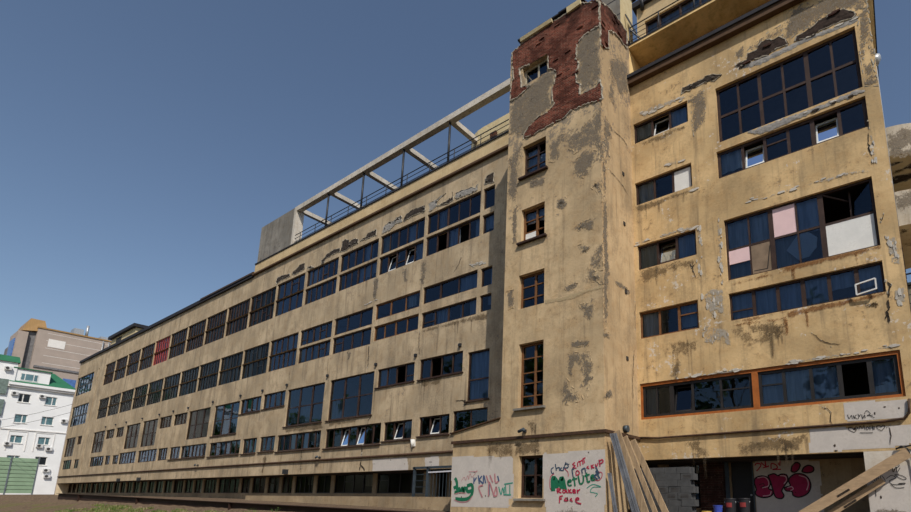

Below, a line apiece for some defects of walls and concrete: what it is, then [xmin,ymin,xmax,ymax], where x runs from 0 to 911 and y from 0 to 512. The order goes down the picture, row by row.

peeling [638,74,722,136]
peeling [735,0,879,134]
spalling [507,0,630,338]
peeling [887,126,911,211]
spalling [276,172,495,284]
peeling [635,225,703,278]
peeling [701,217,730,345]